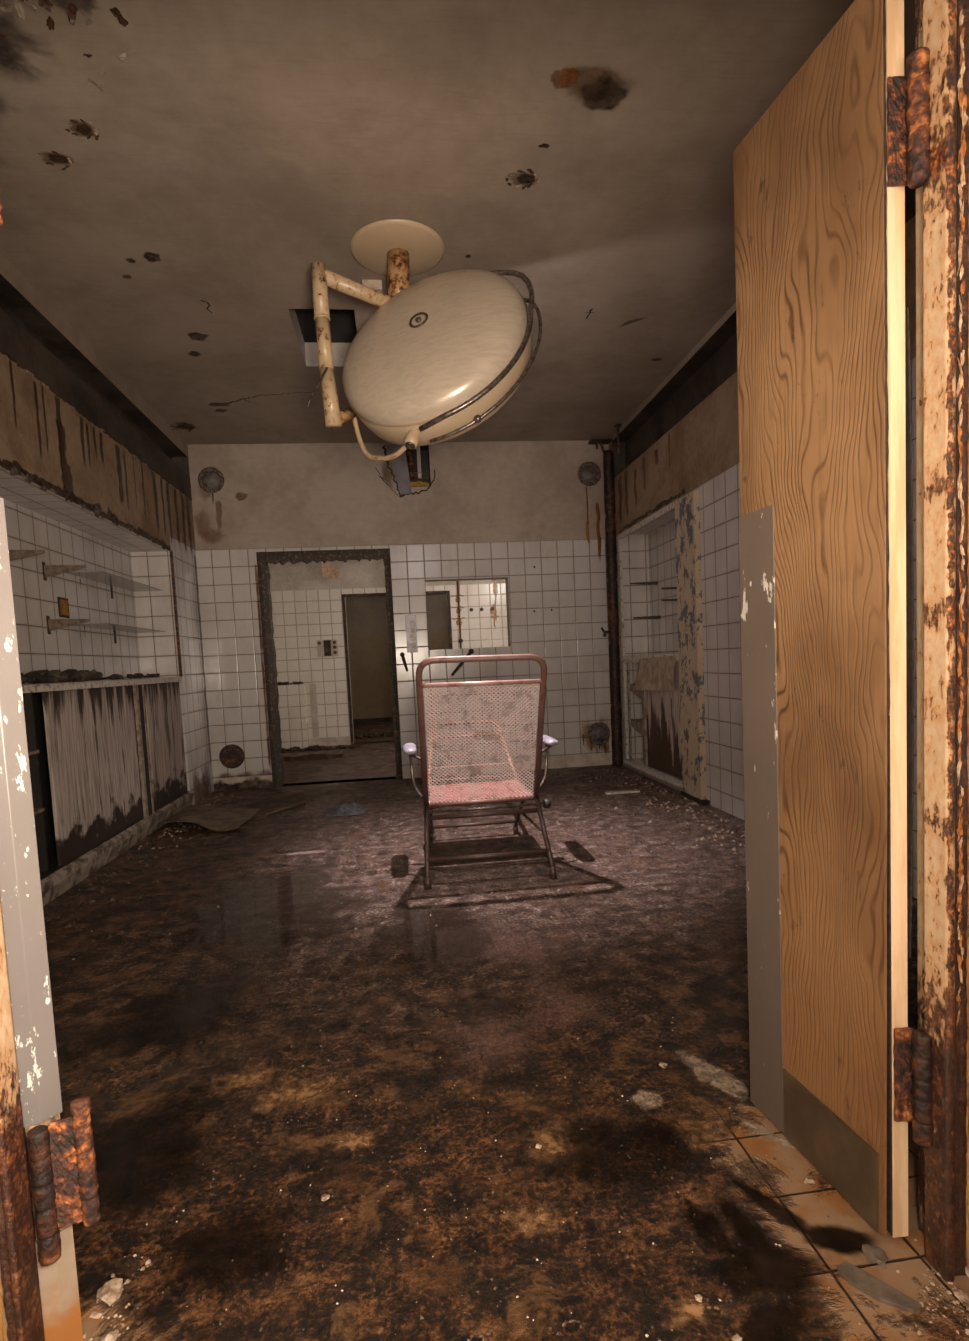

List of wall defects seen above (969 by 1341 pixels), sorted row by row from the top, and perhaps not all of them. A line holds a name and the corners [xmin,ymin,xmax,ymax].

leakage [0,0,95,73]
leakage [109,7,129,27]
leakage [552,68,627,110]
leakage [9,360,17,426]
leakage [0,381,273,804]